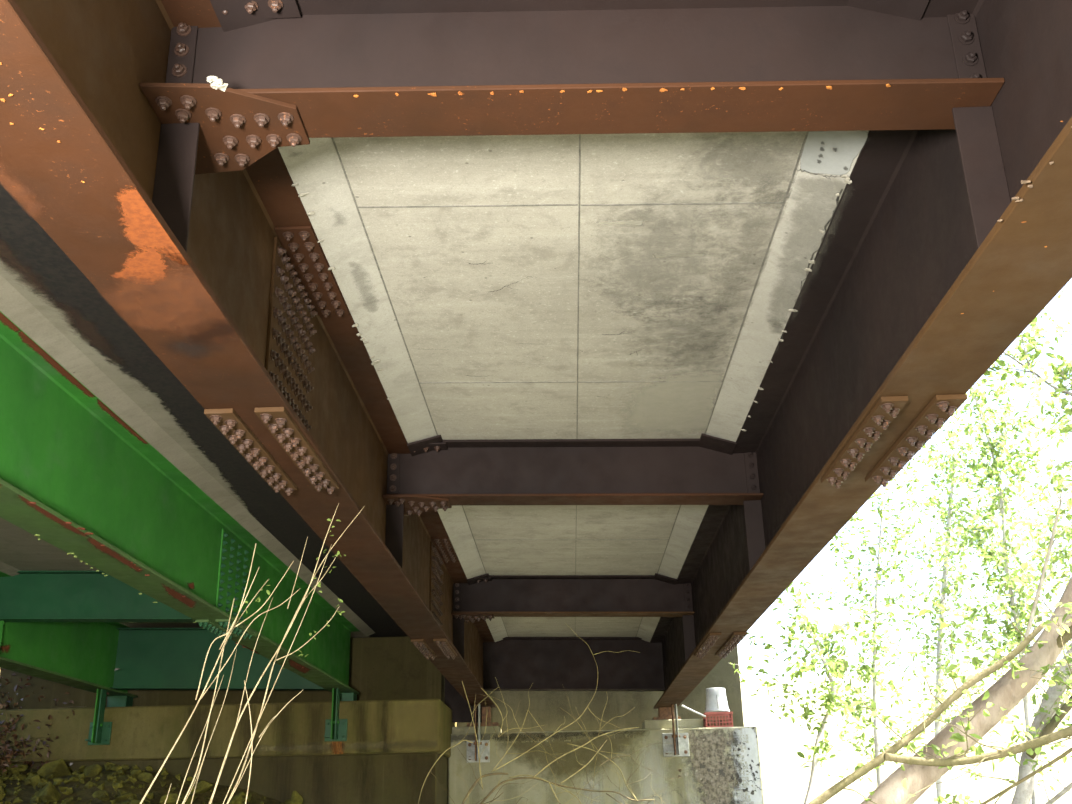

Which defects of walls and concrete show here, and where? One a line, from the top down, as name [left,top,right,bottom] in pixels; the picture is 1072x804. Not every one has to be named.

corrosion [110,185,189,285]
leakage [0,181,408,637]
leakage [731,728,762,804]